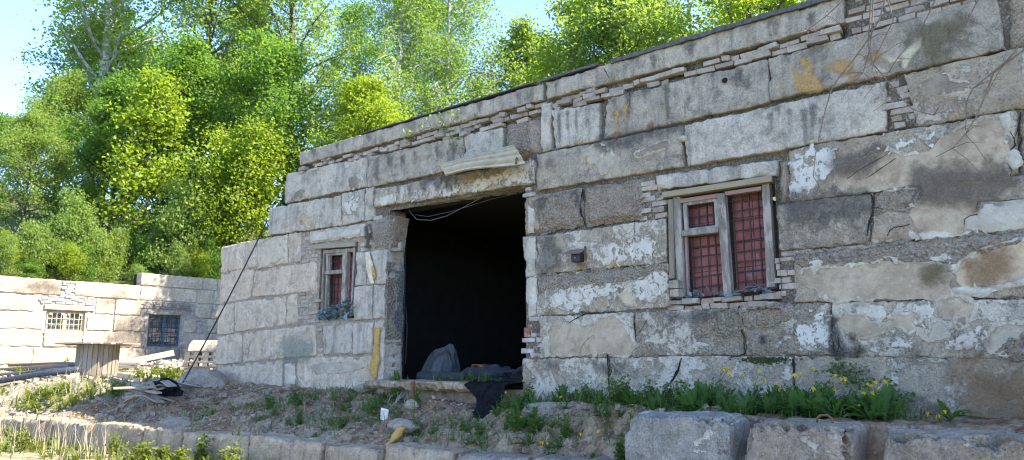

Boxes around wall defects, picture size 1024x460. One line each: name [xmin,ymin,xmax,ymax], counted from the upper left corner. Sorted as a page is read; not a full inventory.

rust [793,57,823,93]
crack [847,154,910,236]
flaking render [526,138,670,359]
flaking render [692,112,1024,363]
crack [661,358,682,398]